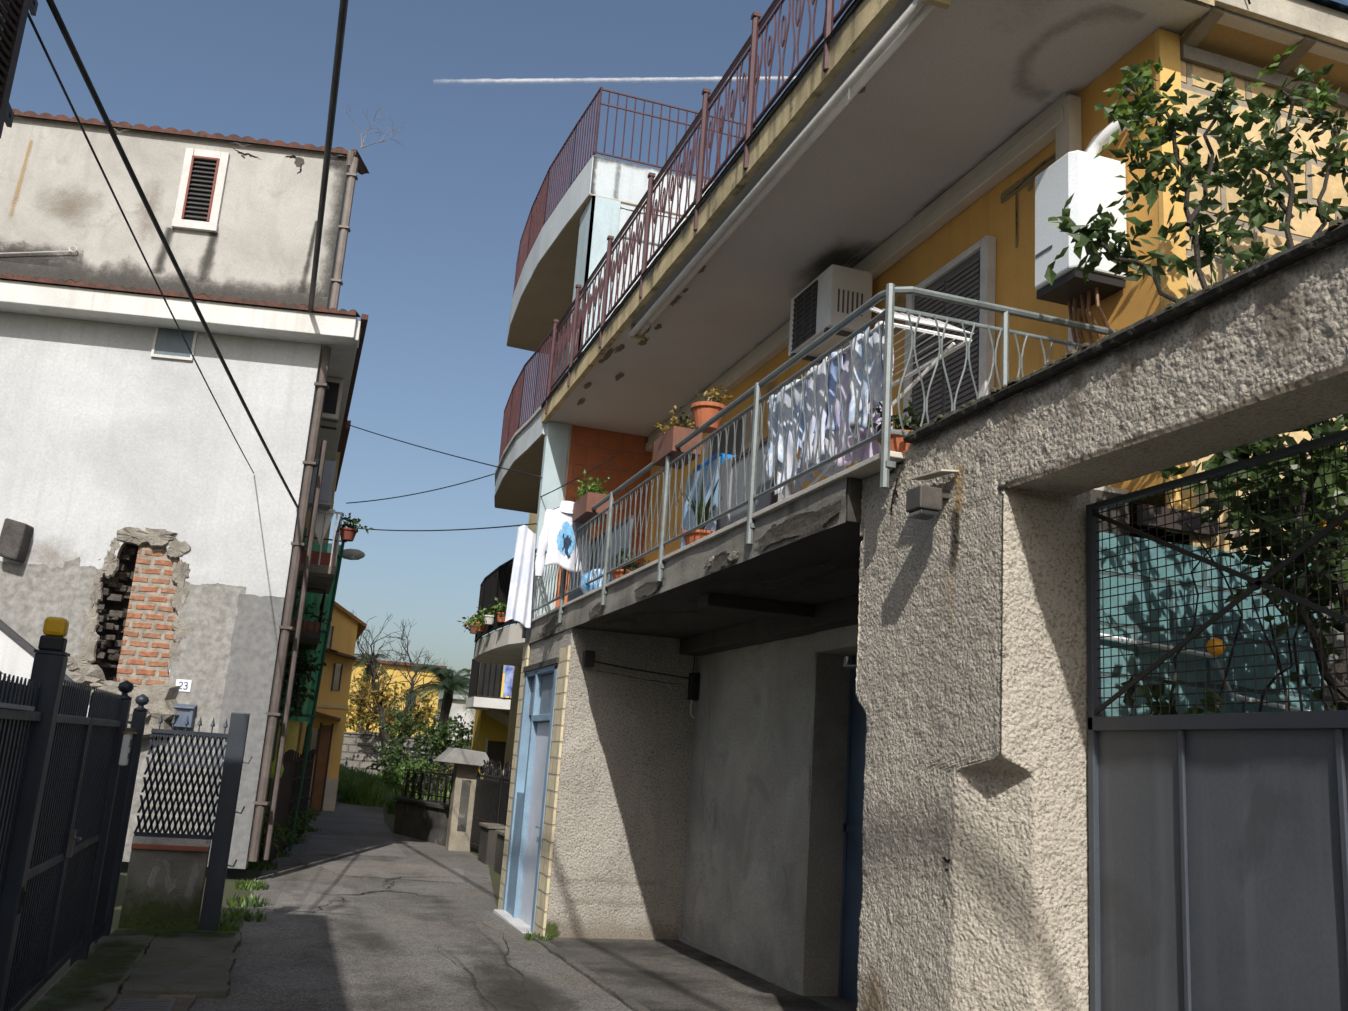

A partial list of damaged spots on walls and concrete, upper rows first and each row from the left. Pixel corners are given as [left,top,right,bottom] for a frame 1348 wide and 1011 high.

damp [0,156,347,309]
spalling [704,551,739,572]
spalling [754,499,841,551]
peeling [0,527,246,862]